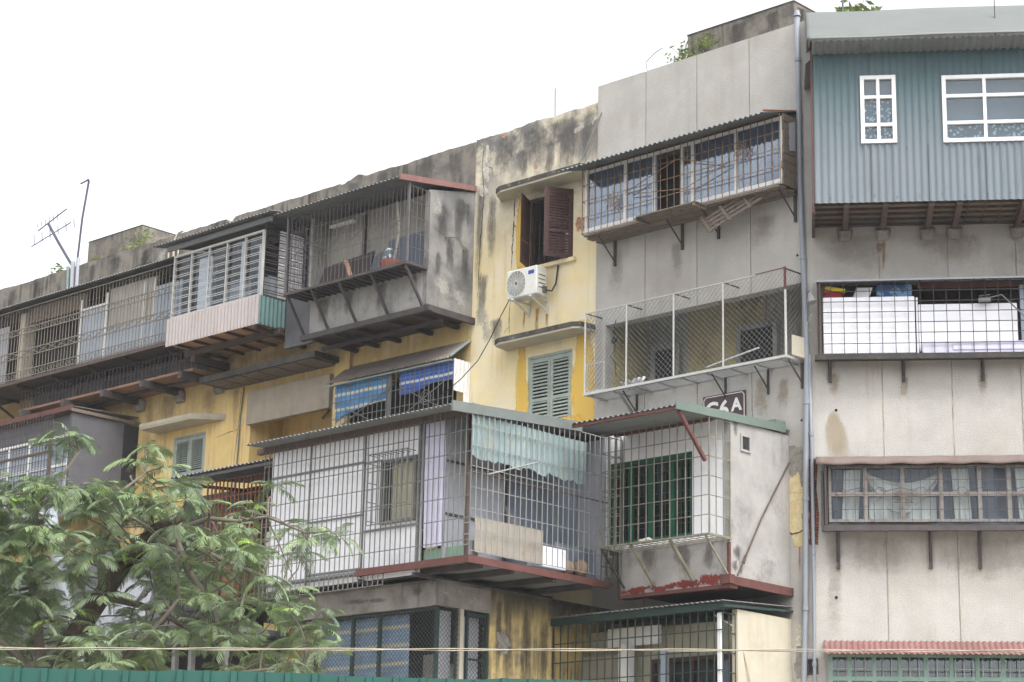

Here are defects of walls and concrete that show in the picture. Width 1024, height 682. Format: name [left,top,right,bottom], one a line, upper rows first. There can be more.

water stain [498,117,590,167]
water stain [436,196,494,268]
peeling [789,445,819,547]
peeling [620,573,722,595]
water stain [497,607,511,660]
water stain [522,619,553,677]